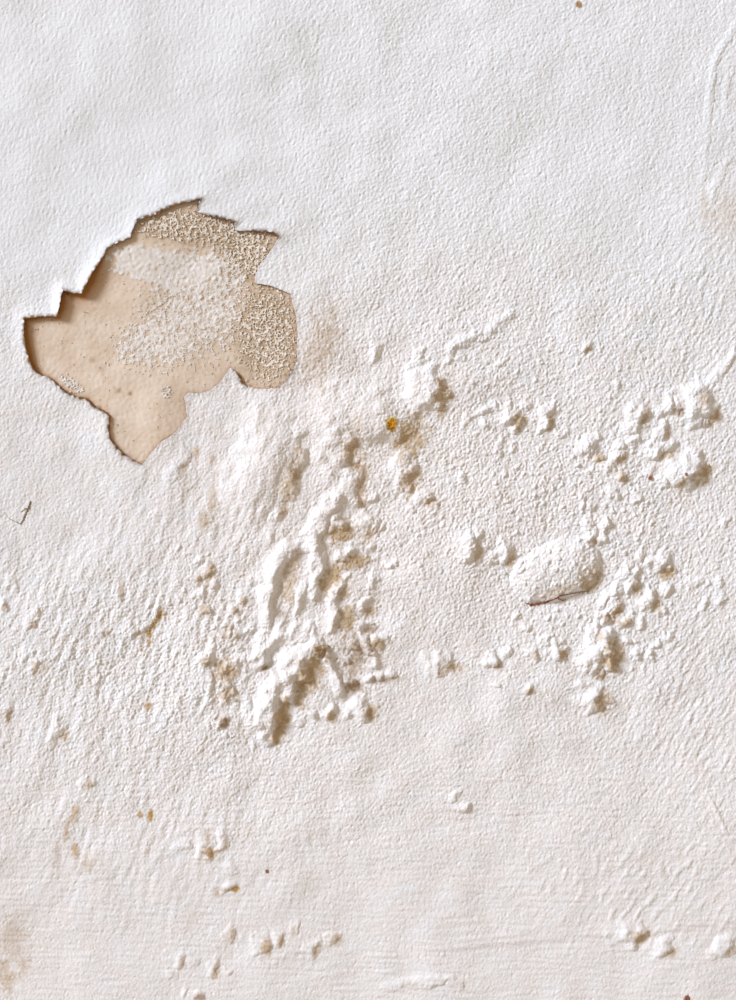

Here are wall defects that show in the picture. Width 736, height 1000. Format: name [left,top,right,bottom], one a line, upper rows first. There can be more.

peeling [8,182,314,482]
leakage [434,378,453,407]
leakage [387,413,426,457]
leakage [331,519,352,541]
leakage [319,556,366,597]
leakage [338,606,354,628]
leakage [603,642,622,671]
leakage [271,648,327,744]